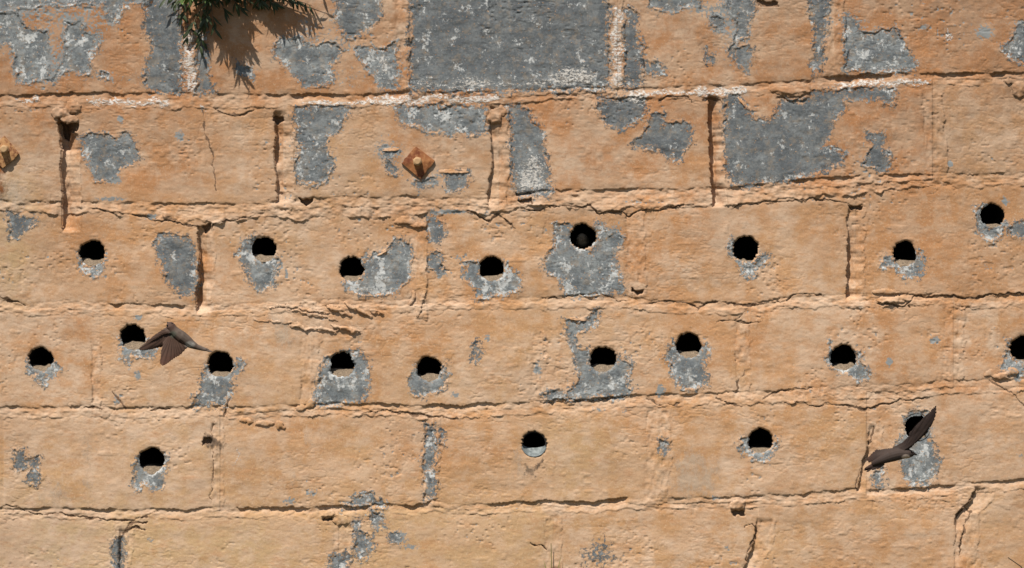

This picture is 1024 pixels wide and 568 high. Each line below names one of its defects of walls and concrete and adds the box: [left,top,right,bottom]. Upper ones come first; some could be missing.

peeling [0,0,221,98]
peeling [235,59,256,83]
peeling [270,0,779,206]
peeling [718,0,919,191]
peeling [60,122,144,184]
crack [202,109,254,191]
peeling [151,223,211,300]
peeling [538,220,643,405]
peeling [418,422,448,504]
crack [954,491,975,555]